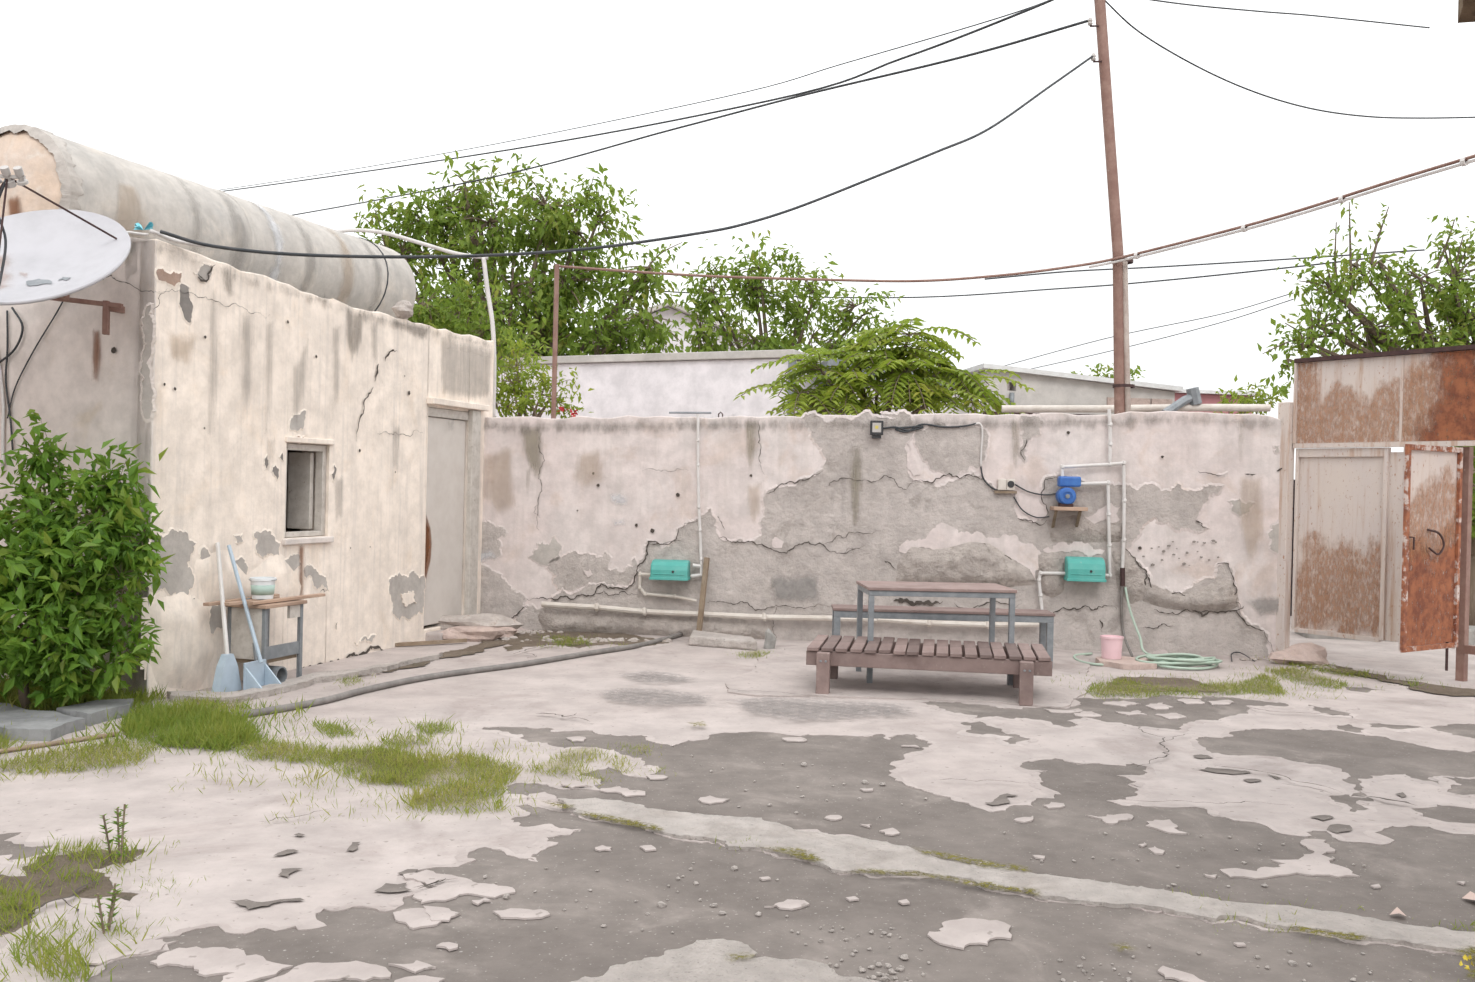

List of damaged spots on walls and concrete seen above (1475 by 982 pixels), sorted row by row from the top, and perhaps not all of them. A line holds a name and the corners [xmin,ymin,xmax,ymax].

rust [1297,350,1475,443]
peeling [143,527,226,636]
peeling [388,570,426,621]
peeling [480,409,1271,657]
rust [1296,533,1381,634]
rust [1406,468,1457,647]